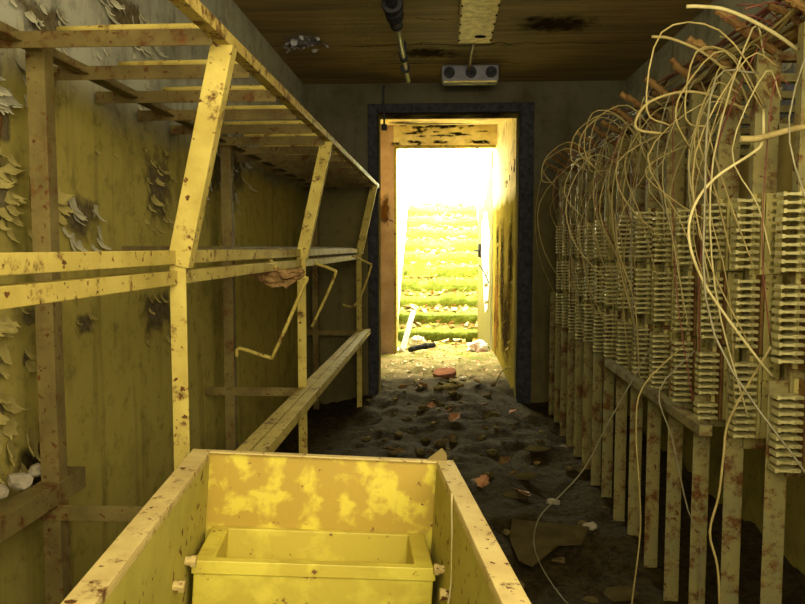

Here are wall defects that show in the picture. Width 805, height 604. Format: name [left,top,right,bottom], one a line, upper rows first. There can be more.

peeling [0,77,27,115]
peeling [390,114,505,145]
peeling [0,146,32,243]